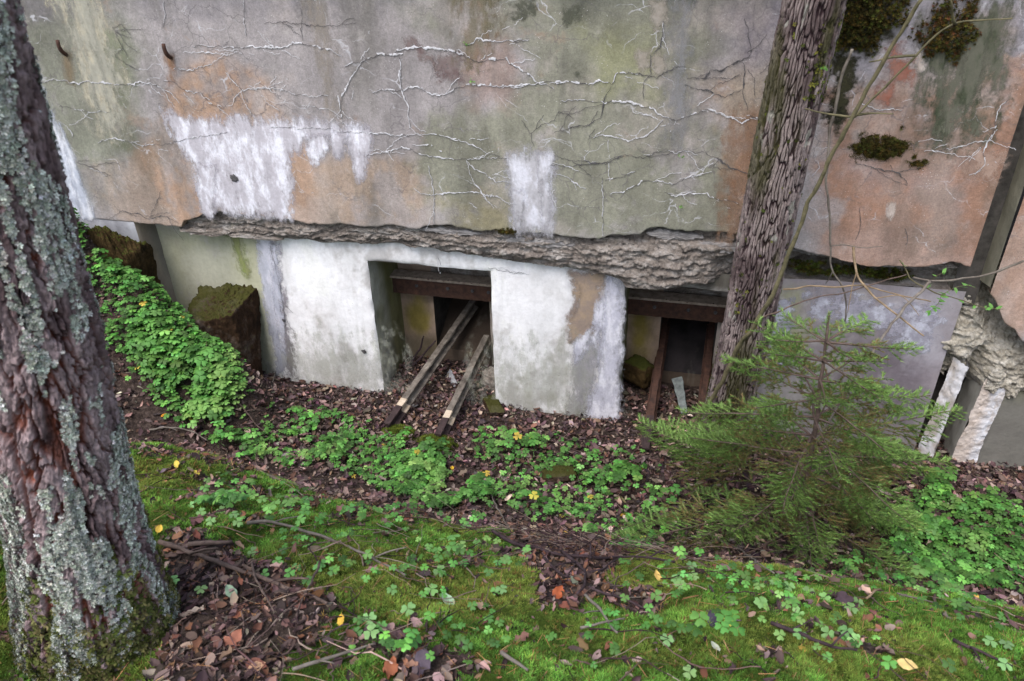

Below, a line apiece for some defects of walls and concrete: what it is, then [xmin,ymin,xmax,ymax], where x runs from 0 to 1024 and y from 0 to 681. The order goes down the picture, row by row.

damp [162,0,374,222]
crack [43,0,769,274]
damp [506,148,558,236]
crack [856,100,1016,186]
spalling [180,211,737,344]
damp [565,276,626,420]
spalling [784,248,960,290]
spalling [940,257,1024,399]